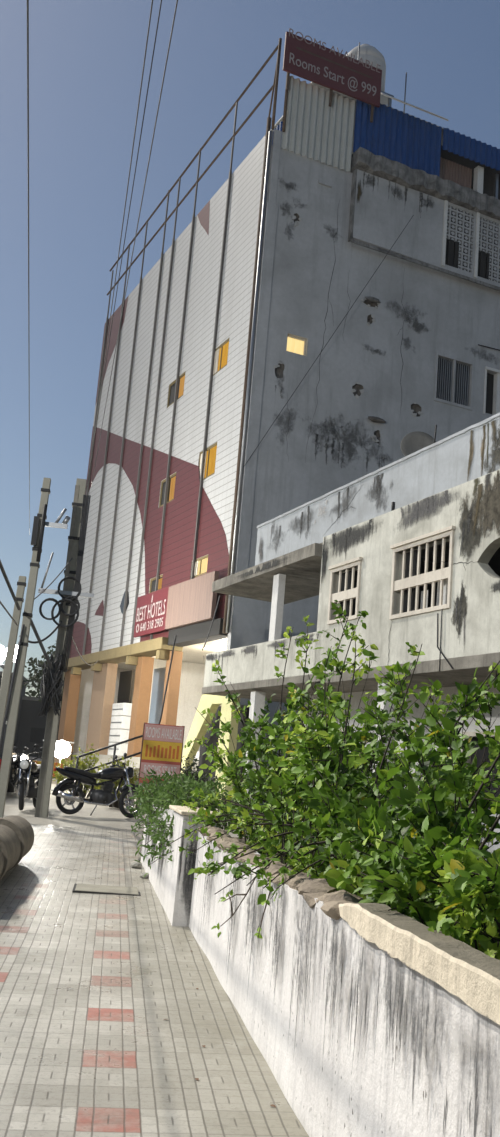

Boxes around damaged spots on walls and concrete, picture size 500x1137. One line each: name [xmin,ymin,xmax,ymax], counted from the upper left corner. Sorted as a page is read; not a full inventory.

spalling [361,299,379,326]
spalling [274,360,284,378]
spalling [351,382,364,399]
spalling [411,402,424,417]
leakage [334,487,351,516]
leakage [311,422,393,507]
leakage [399,421,500,561]
leakage [321,519,377,583]
leakage [451,583,467,641]
leakage [179,834,214,933]
leakage [227,859,437,1100]
leakage [461,1016,496,1137]